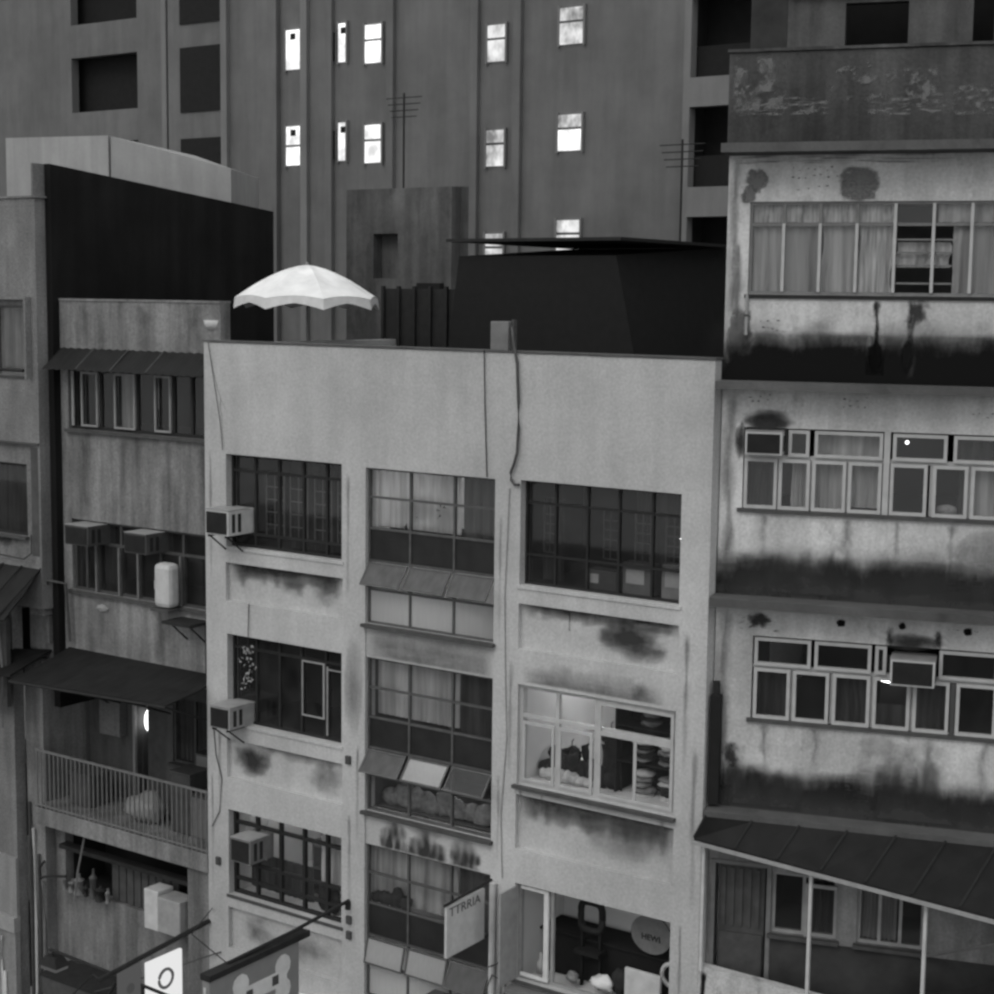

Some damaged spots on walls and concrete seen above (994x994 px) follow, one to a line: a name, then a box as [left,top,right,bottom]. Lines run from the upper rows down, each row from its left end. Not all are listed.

leakage [719,336,994,387]
leakage [238,564,338,589]
leakage [715,558,994,611]
leakage [532,605,671,656]
leakage [240,750,267,773]
leakage [718,744,994,834]
leakage [530,797,667,843]
leakage [381,825,480,869]